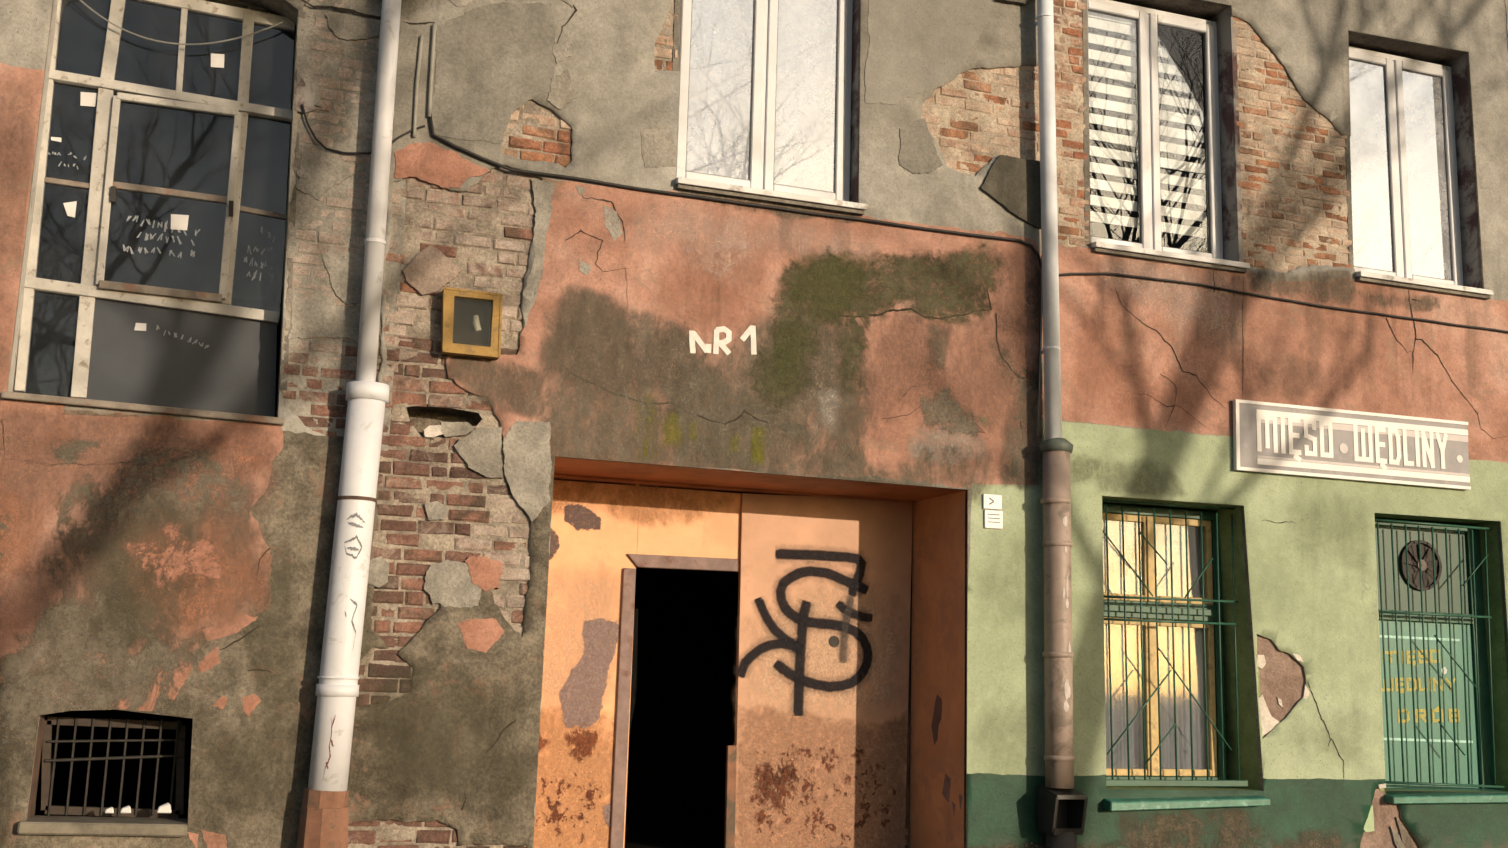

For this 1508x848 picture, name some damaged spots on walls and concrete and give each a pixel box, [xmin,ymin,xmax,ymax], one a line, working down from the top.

flaking render [280,0,382,438]
crack [557,4,577,43]
flaking render [921,0,1090,248]
flaking render [1233,17,1352,273]
flaking render [355,42,576,707]
water stain [450,254,1037,497]
crack [1115,272,1244,428]
crack [1386,290,1506,439]
water stain [0,412,288,693]
rust [536,729,612,843]
rust [750,744,900,847]
flaking render [1360,784,1418,848]